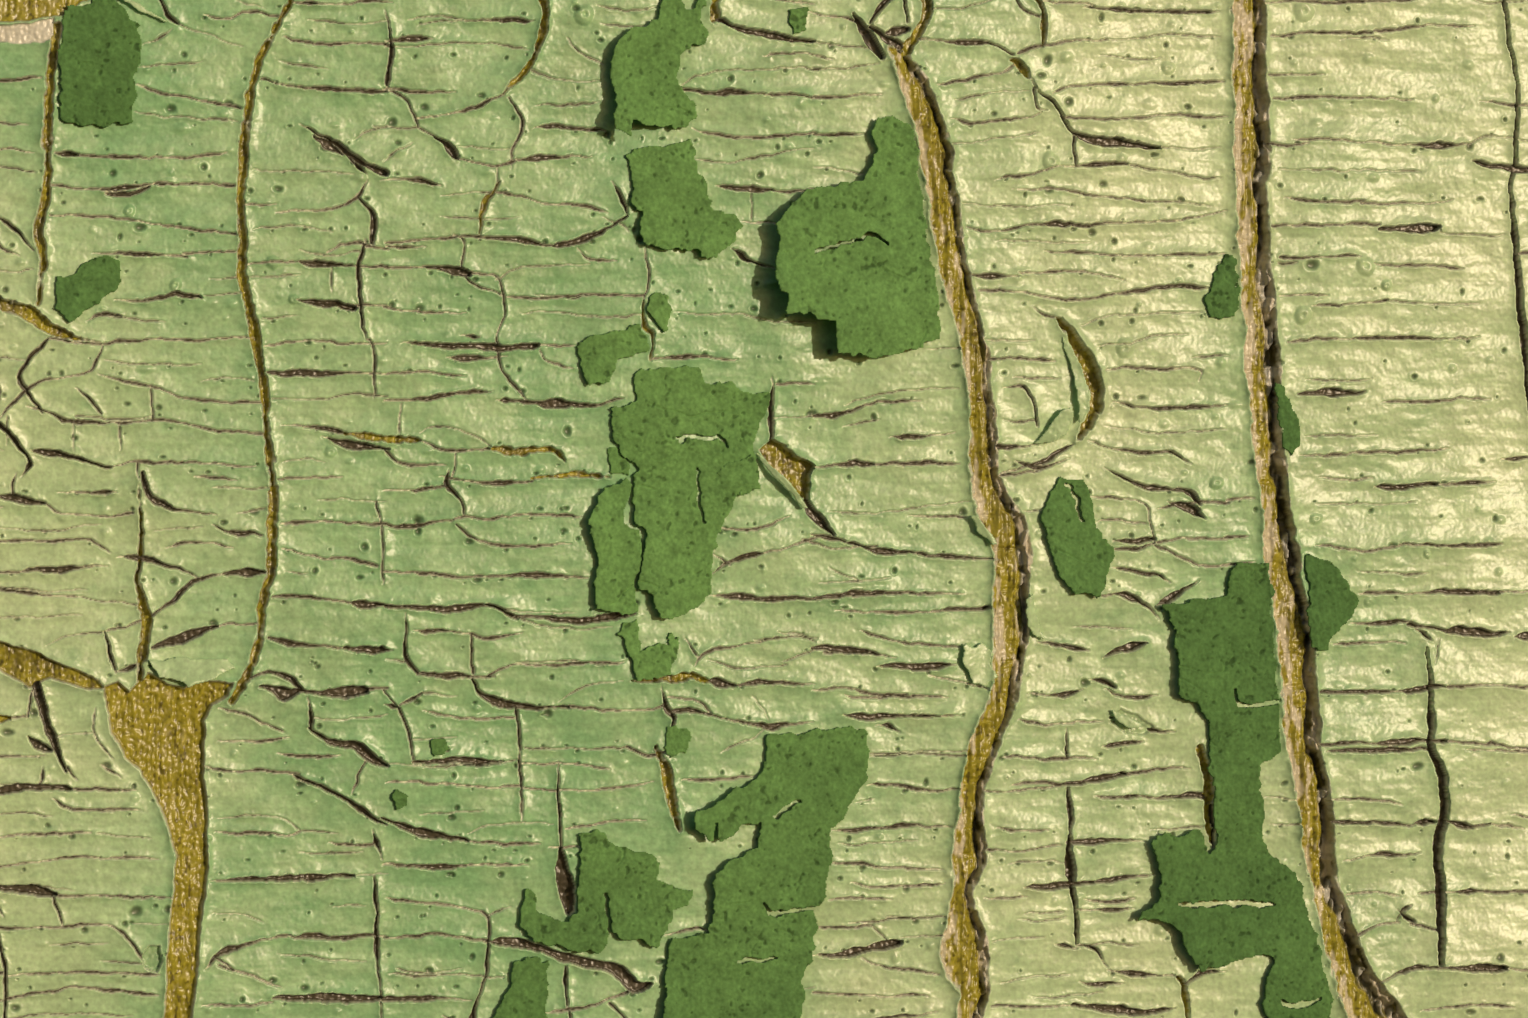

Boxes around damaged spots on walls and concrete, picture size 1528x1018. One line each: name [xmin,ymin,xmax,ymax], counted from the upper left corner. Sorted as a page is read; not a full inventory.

peeling [0,255,121,343]
peeling [0,0,167,128]
crack [0,0,995,1018]
peeling [610,0,743,259]
peeling [576,292,816,681]
peeling [775,115,941,358]
crack [919,0,1259,1018]
peeling [1204,254,1241,319]
crack [1262,0,1528,1013]
peeling [0,638,237,1018]
peeling [493,725,870,1018]
peeling [1138,562,1334,1018]